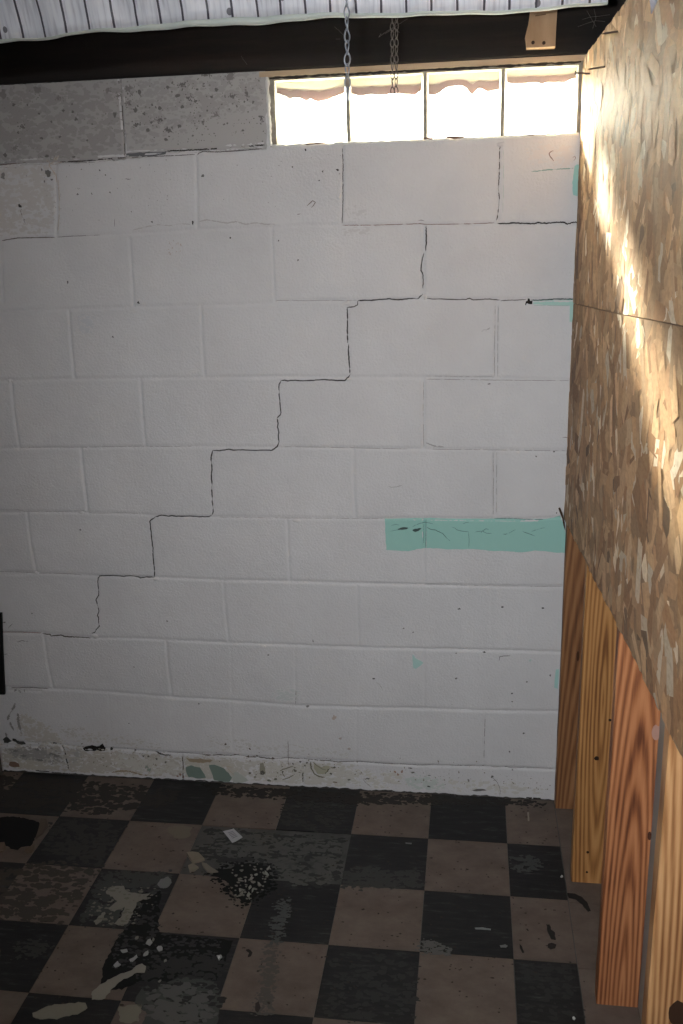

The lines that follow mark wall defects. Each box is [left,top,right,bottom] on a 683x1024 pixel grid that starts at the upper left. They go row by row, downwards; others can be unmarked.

crack [2,148,577,638]
spalling [83,743,113,751]
peeling [10,760,166,777]
peeling [182,755,240,780]